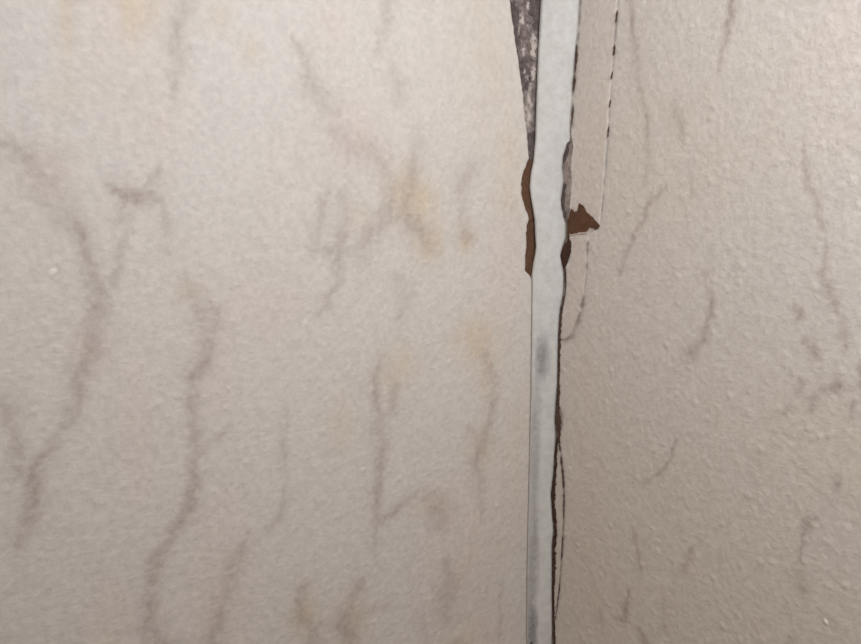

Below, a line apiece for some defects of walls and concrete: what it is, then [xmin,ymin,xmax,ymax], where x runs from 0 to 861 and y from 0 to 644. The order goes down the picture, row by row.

crack [570,44,578,125]
crack [607,45,616,137]
crack [530,266,583,644]